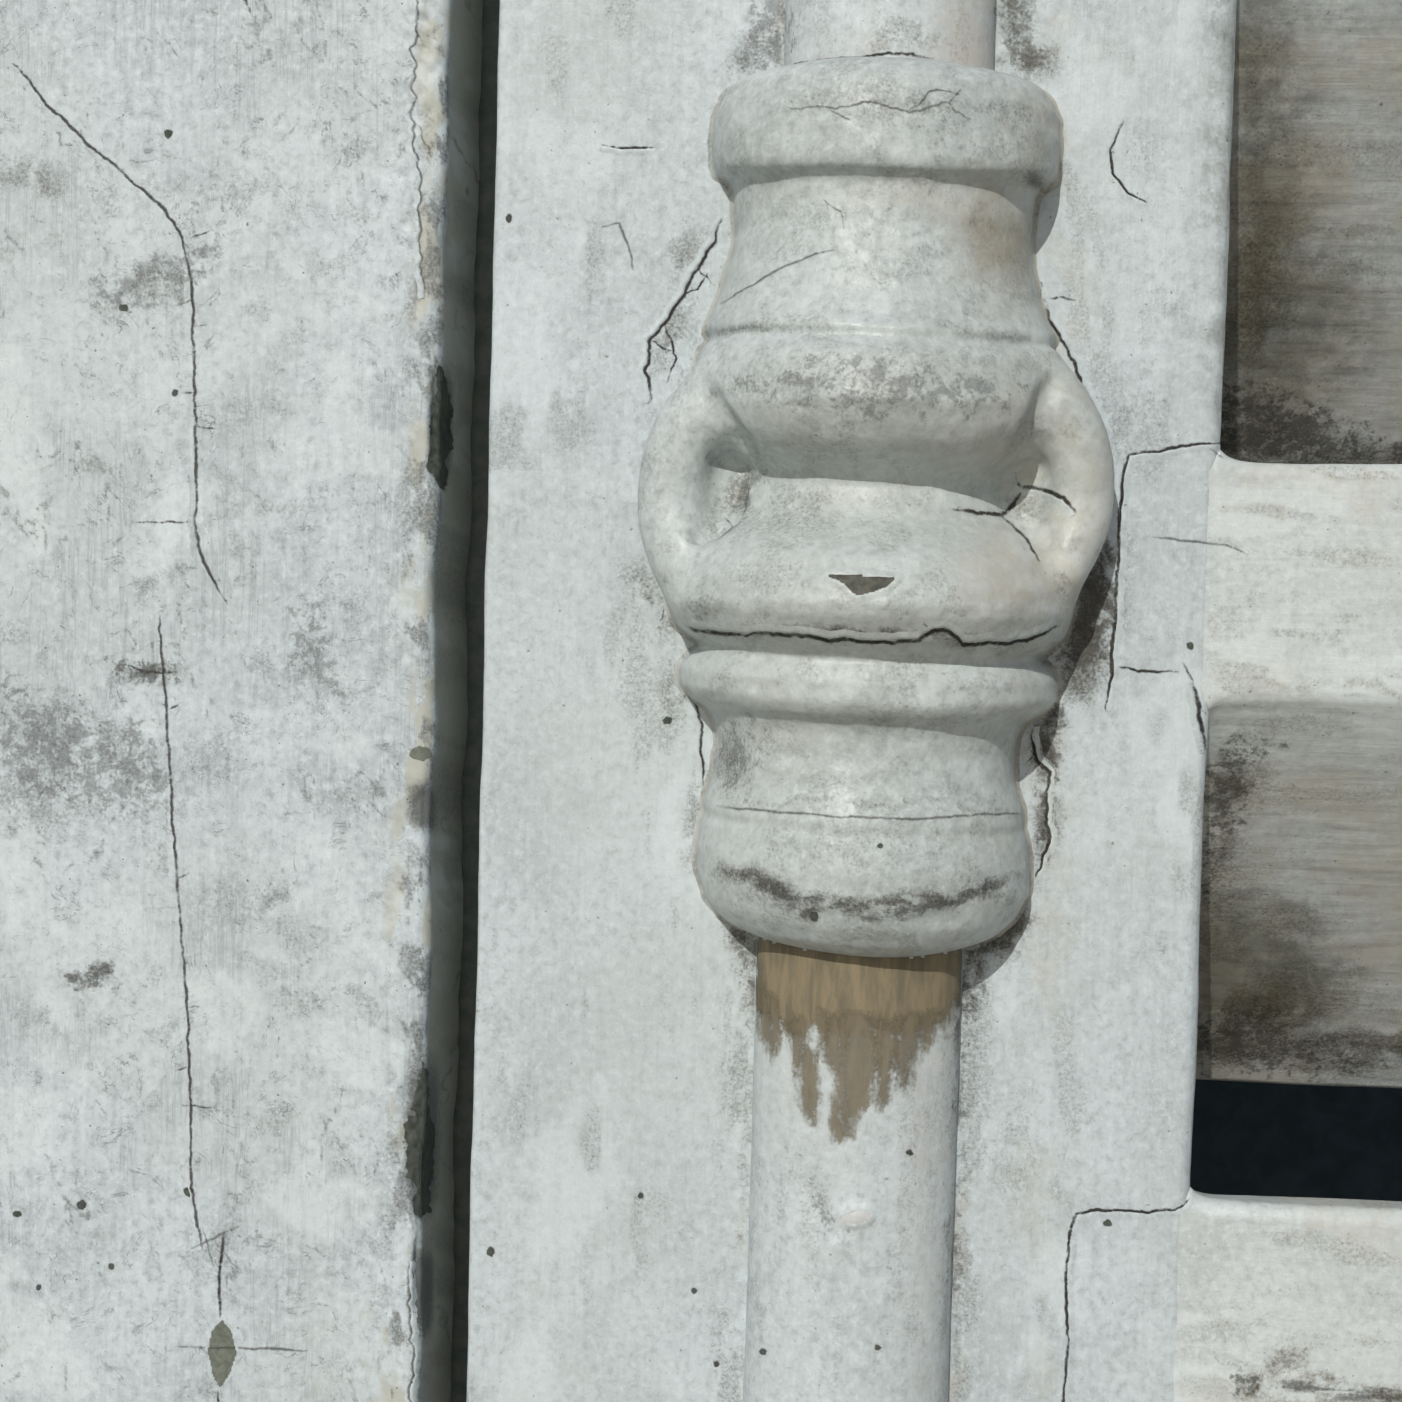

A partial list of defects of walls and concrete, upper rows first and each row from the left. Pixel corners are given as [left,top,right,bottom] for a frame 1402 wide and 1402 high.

crack [6,62,228,610]
crack [637,216,817,403]
leakage [1220,384,1402,464]
peeling [813,566,905,604]
crack [662,610,1059,647]
crack [1041,282,1220,754]
leakage [1201,735,1266,894]
crack [128,613,294,1351]
corrosion [756,937,962,1142]
leakage [1197,999,1389,1082]
peeling [202,1314,241,1393]
crack [1062,1198,1195,1402]